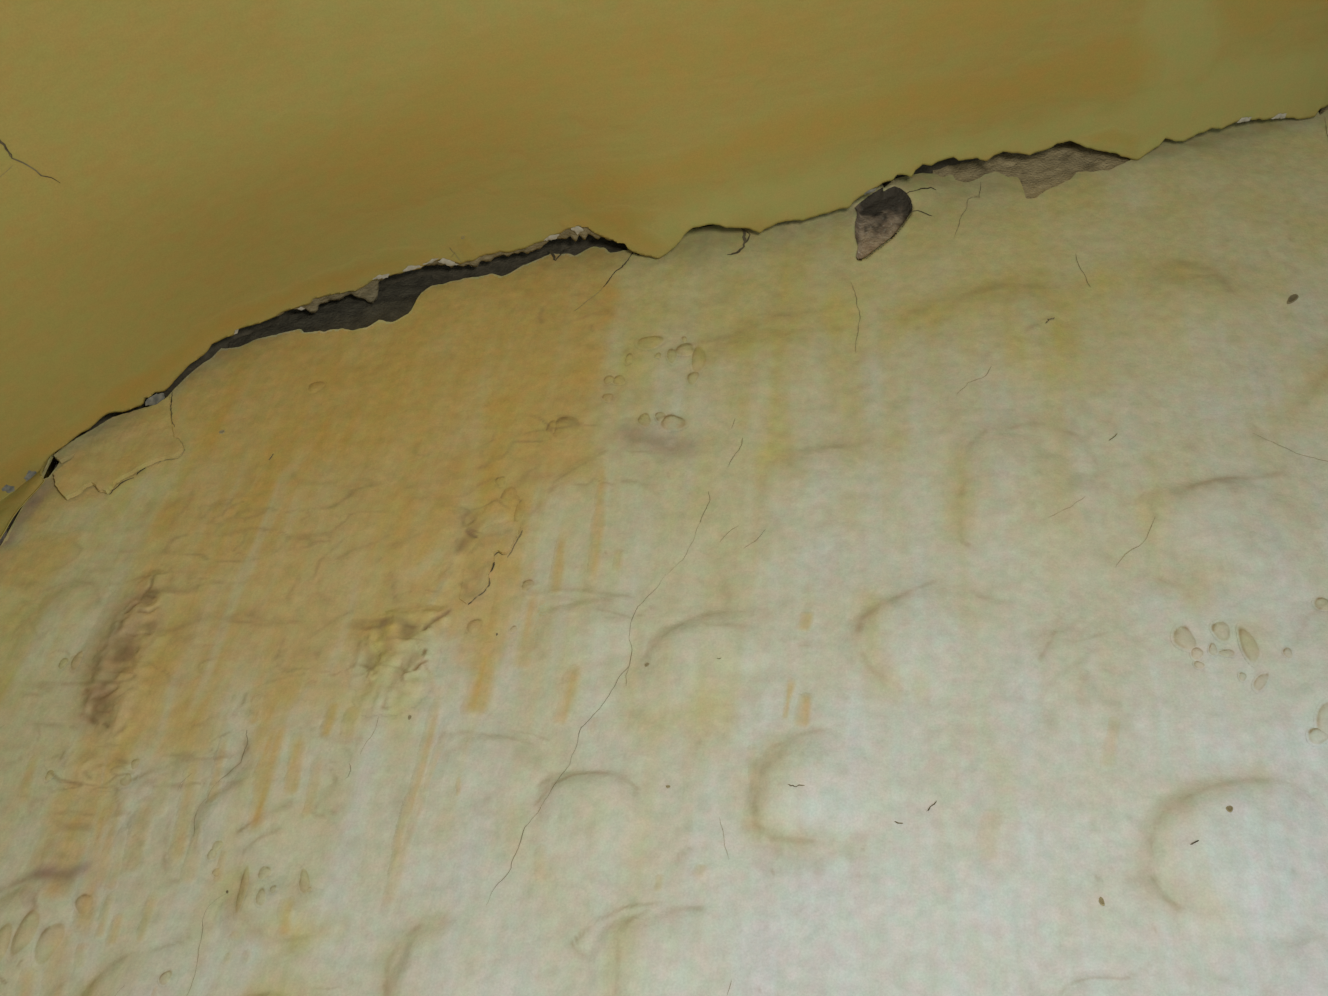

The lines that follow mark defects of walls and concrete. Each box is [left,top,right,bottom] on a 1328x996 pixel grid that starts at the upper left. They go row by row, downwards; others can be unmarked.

crack [0,140,60,183]
spalling [933,142,1129,199]
spalling [855,186,913,260]
spalling [229,275,433,348]
peeling [0,466,45,546]
leakage [0,243,710,996]
crack [487,491,765,904]